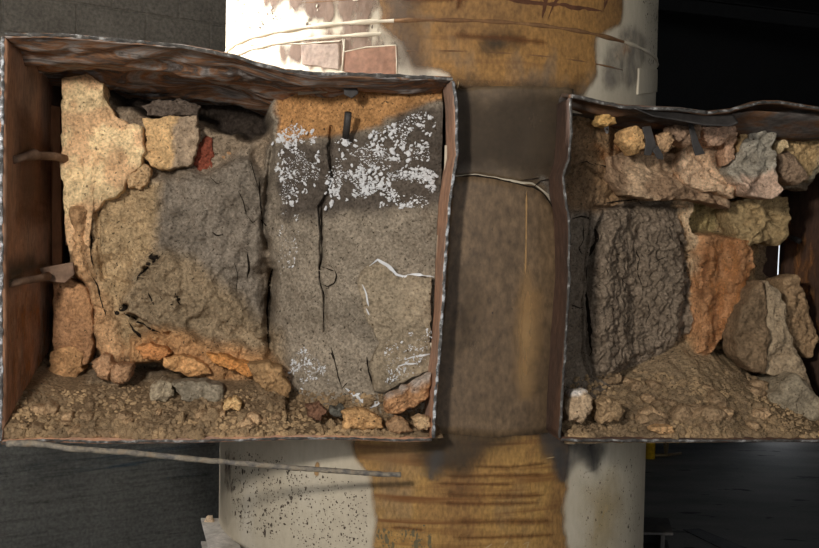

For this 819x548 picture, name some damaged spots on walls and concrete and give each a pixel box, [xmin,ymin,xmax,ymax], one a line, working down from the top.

peeling [264,0,384,67]
rust [379,0,623,96]
damp [271,112,439,221]
spalling [592,114,814,246]
spalling [48,346,136,384]
crack [318,131,347,388]
spalling [305,260,432,435]
damp [371,259,433,278]
spalling [563,387,625,424]
crack [572,215,679,356]
spalling [721,274,819,390]
rust [353,433,567,548]